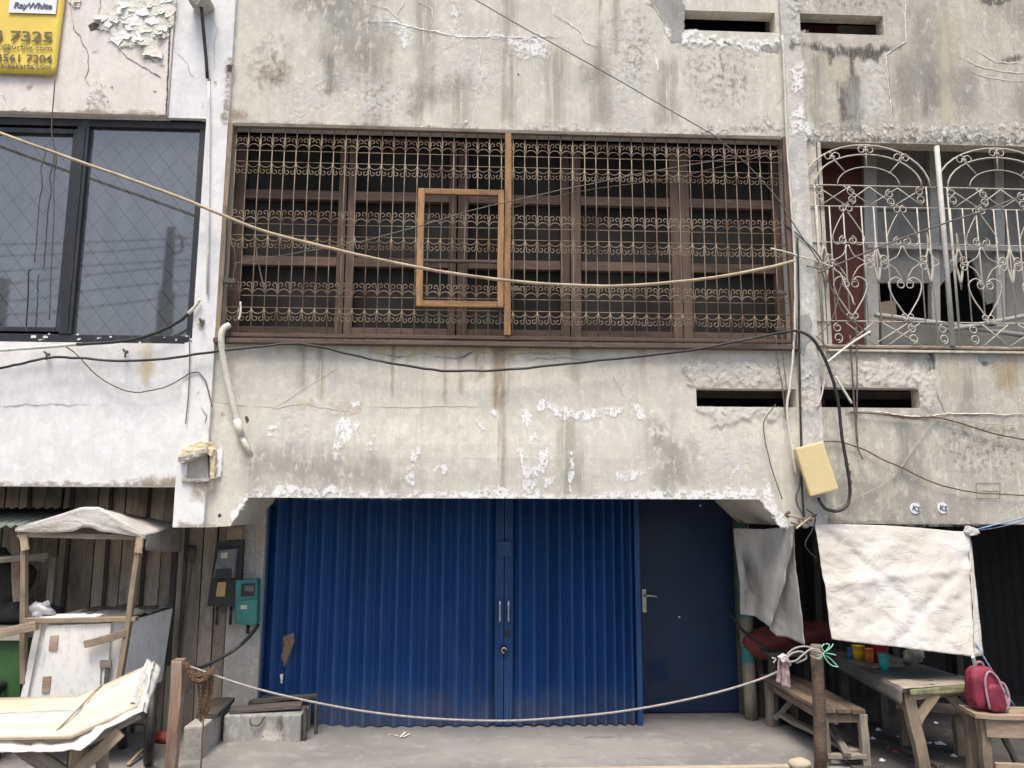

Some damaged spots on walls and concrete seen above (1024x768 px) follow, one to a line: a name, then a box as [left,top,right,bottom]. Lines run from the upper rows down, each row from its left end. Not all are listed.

crack [70,7,89,85]
peeling [88,0,177,58]
crack [360,2,595,85]
peeling [500,61,1024,145]
water stain [810,43,891,120]
peeling [552,406,623,421]
peeling [178,409,787,527]